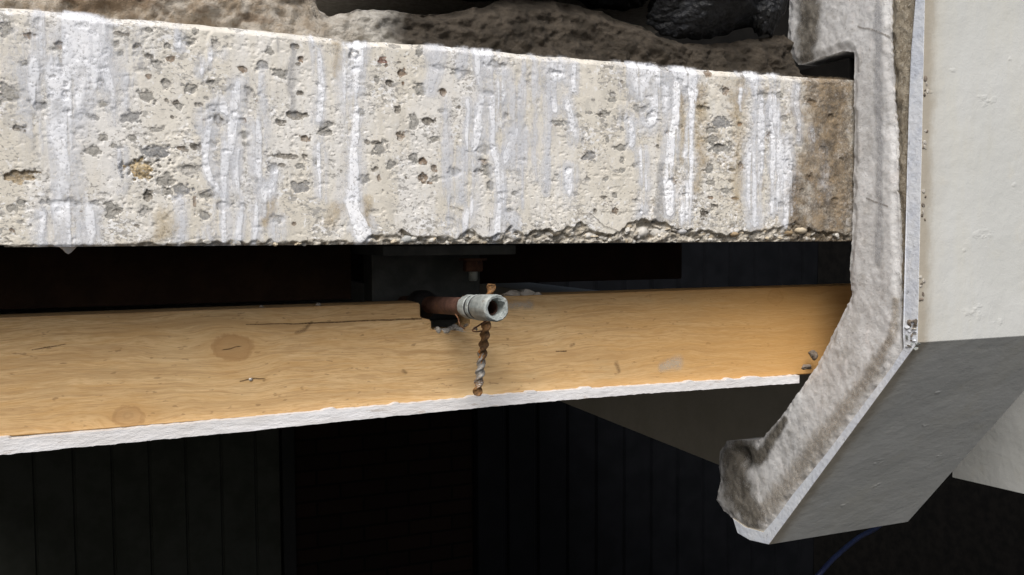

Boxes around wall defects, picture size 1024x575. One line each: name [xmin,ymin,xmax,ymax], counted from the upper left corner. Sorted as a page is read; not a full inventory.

damp [16,10,133,254]
damp [173,195,186,246]
damp [196,73,285,246]
damp [309,36,375,245]
spalling [73,196,849,247]
damp [424,44,582,244]
damp [619,62,700,225]
damp [736,71,830,232]